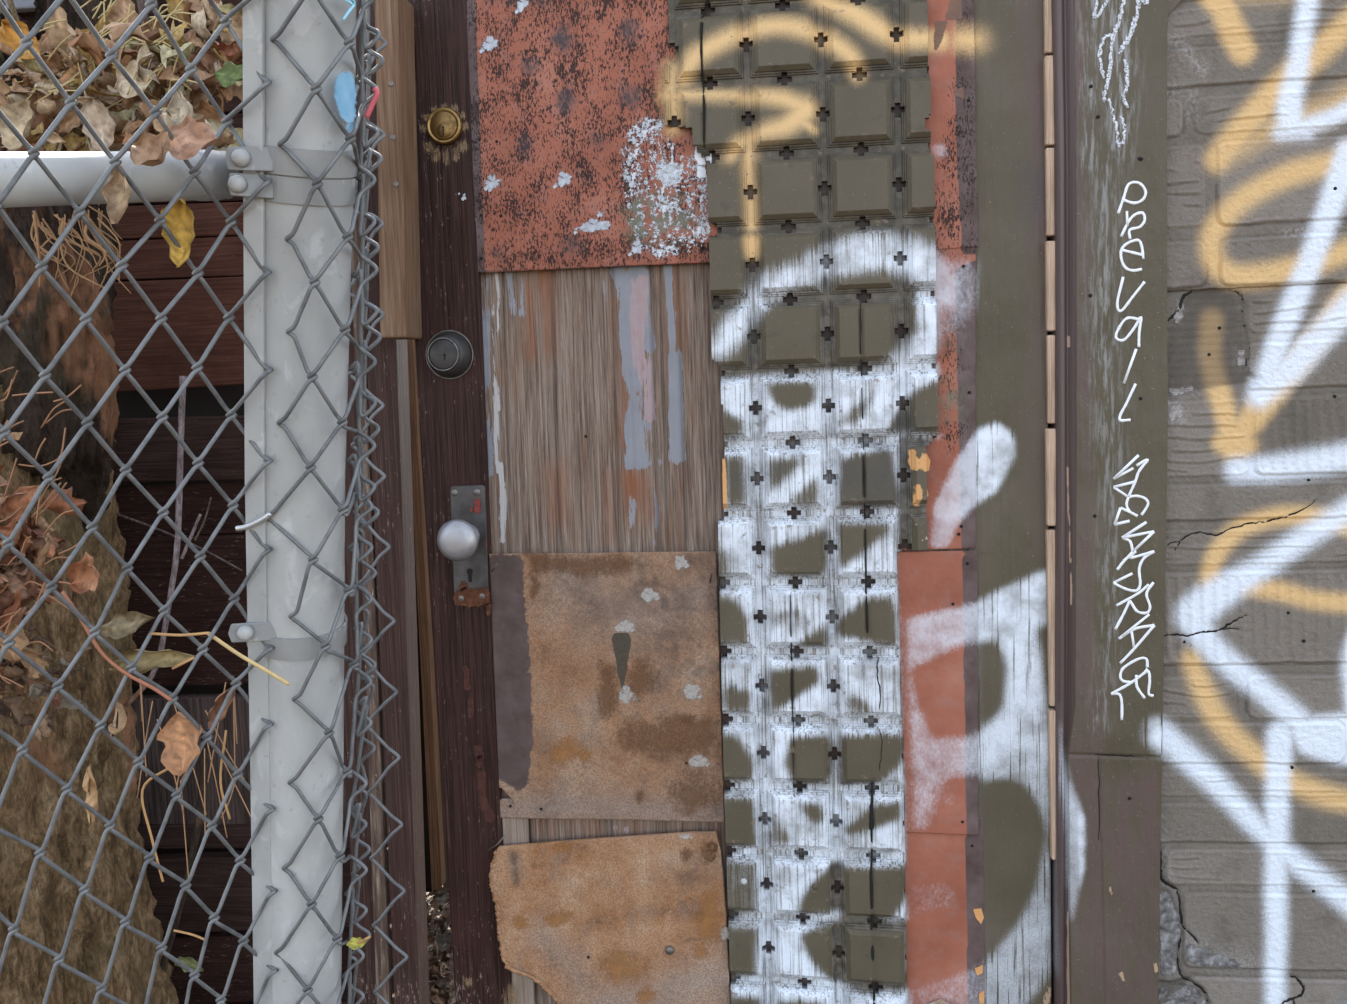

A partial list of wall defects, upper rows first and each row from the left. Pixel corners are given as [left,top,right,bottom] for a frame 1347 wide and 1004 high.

peeling [619,116,711,259]
crack [1167,500,1315,550]
corrosion [453,581,492,616]
crack [1164,615,1247,637]
spalling [1159,891,1240,1004]